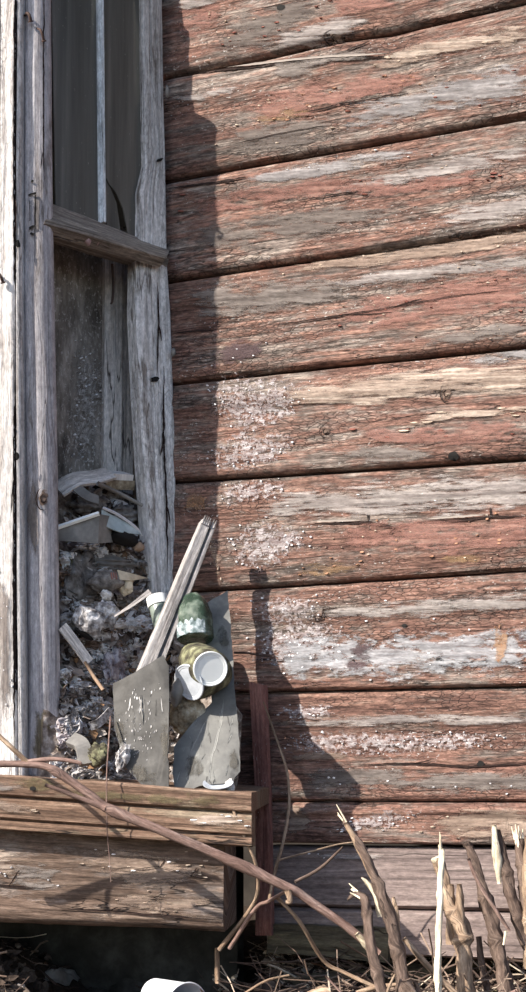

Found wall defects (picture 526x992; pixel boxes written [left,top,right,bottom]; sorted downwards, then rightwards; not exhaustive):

peeling [221,0,394,77]
peeling [233,26,526,152]
peeling [249,139,526,195]
peeling [443,192,526,227]
water stain [206,339,311,470]
water stain [221,478,291,504]
water stain [227,523,312,571]
water stain [246,594,376,671]
water stain [277,704,332,720]
water stain [284,731,506,754]